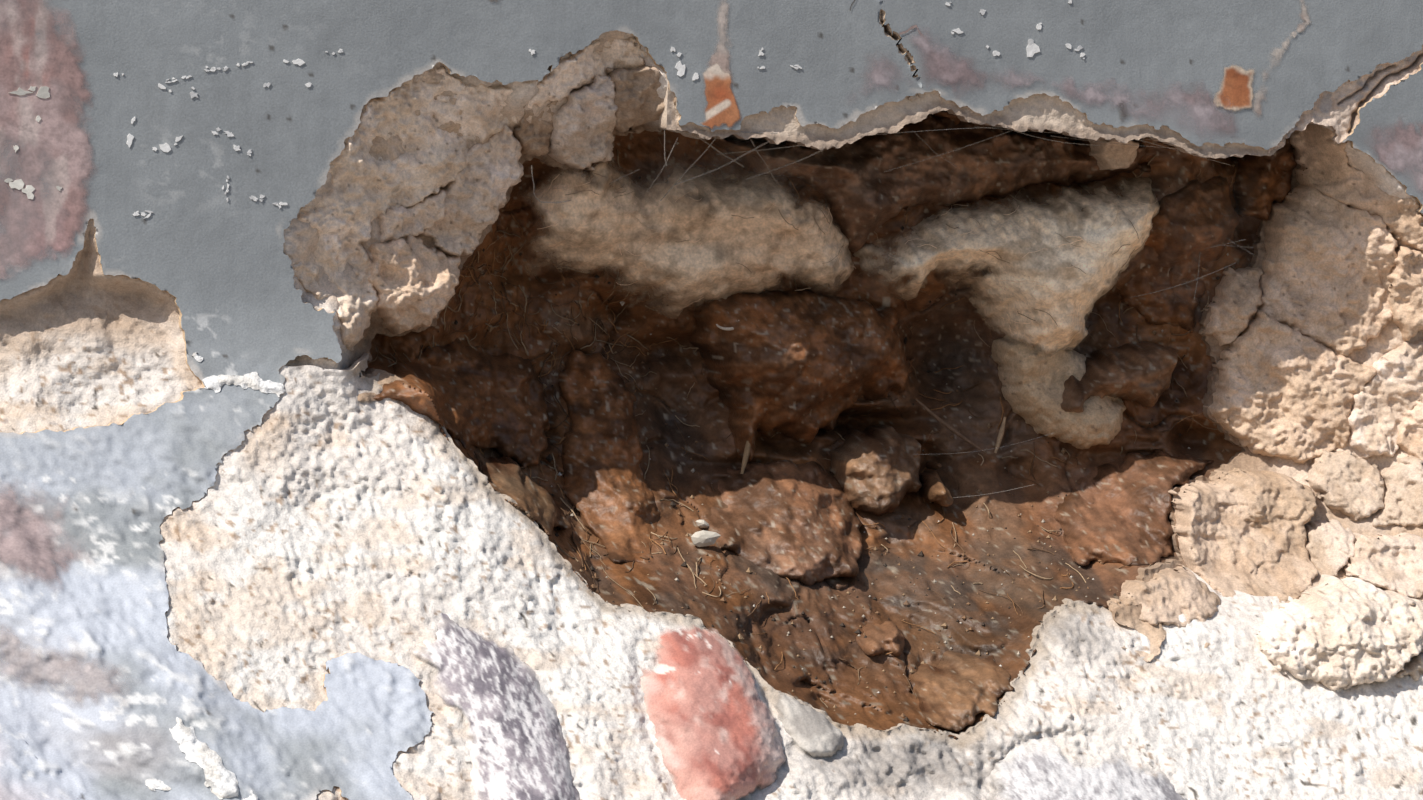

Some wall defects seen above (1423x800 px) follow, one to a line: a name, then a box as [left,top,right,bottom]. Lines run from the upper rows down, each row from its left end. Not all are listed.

leakage [0,0,92,277]
peeling [152,136,182,152]
peeling [158,61,253,98]
rust [701,63,740,128]
crack [850,0,924,100]
peeling [1026,23,1042,57]
rust [1213,65,1254,111]
crack [1268,45,1423,153]
flaking render [0,219,203,434]
spalling [283,46,1423,800]
flaking render [159,353,705,800]
peeling [145,779,171,791]